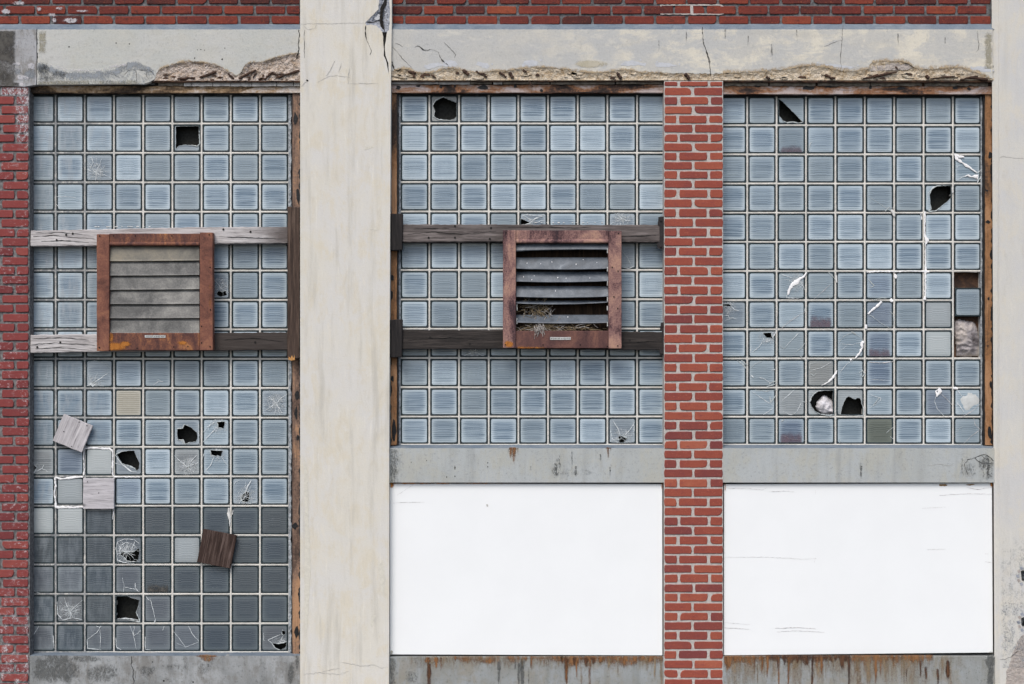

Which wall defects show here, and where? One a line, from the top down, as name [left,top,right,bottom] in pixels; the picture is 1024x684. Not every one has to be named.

crack [296,0,456,87]
spalling [154,49,308,81]
spalling [391,59,994,87]
rust [425,656,663,684]
rust [724,655,952,684]